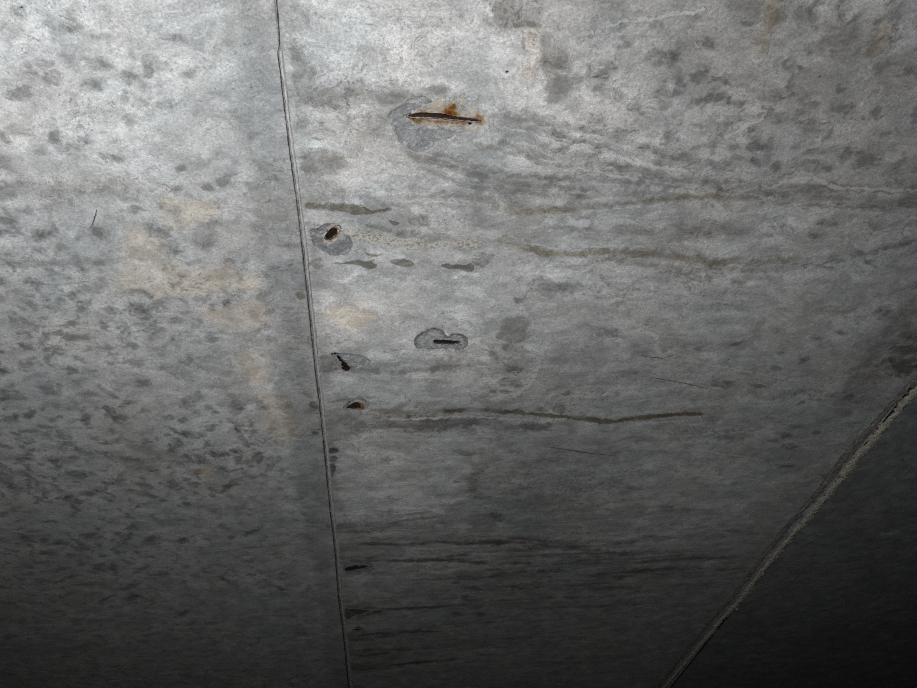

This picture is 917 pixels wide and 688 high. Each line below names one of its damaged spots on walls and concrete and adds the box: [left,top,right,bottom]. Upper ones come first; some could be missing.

damp [8,5,30,22]
damp [59,6,86,35]
damp [155,32,187,43]
damp [177,68,197,84]
damp [0,50,177,158]
damp [97,152,124,164]
damp [0,173,706,513]
damp [0,524,161,587]